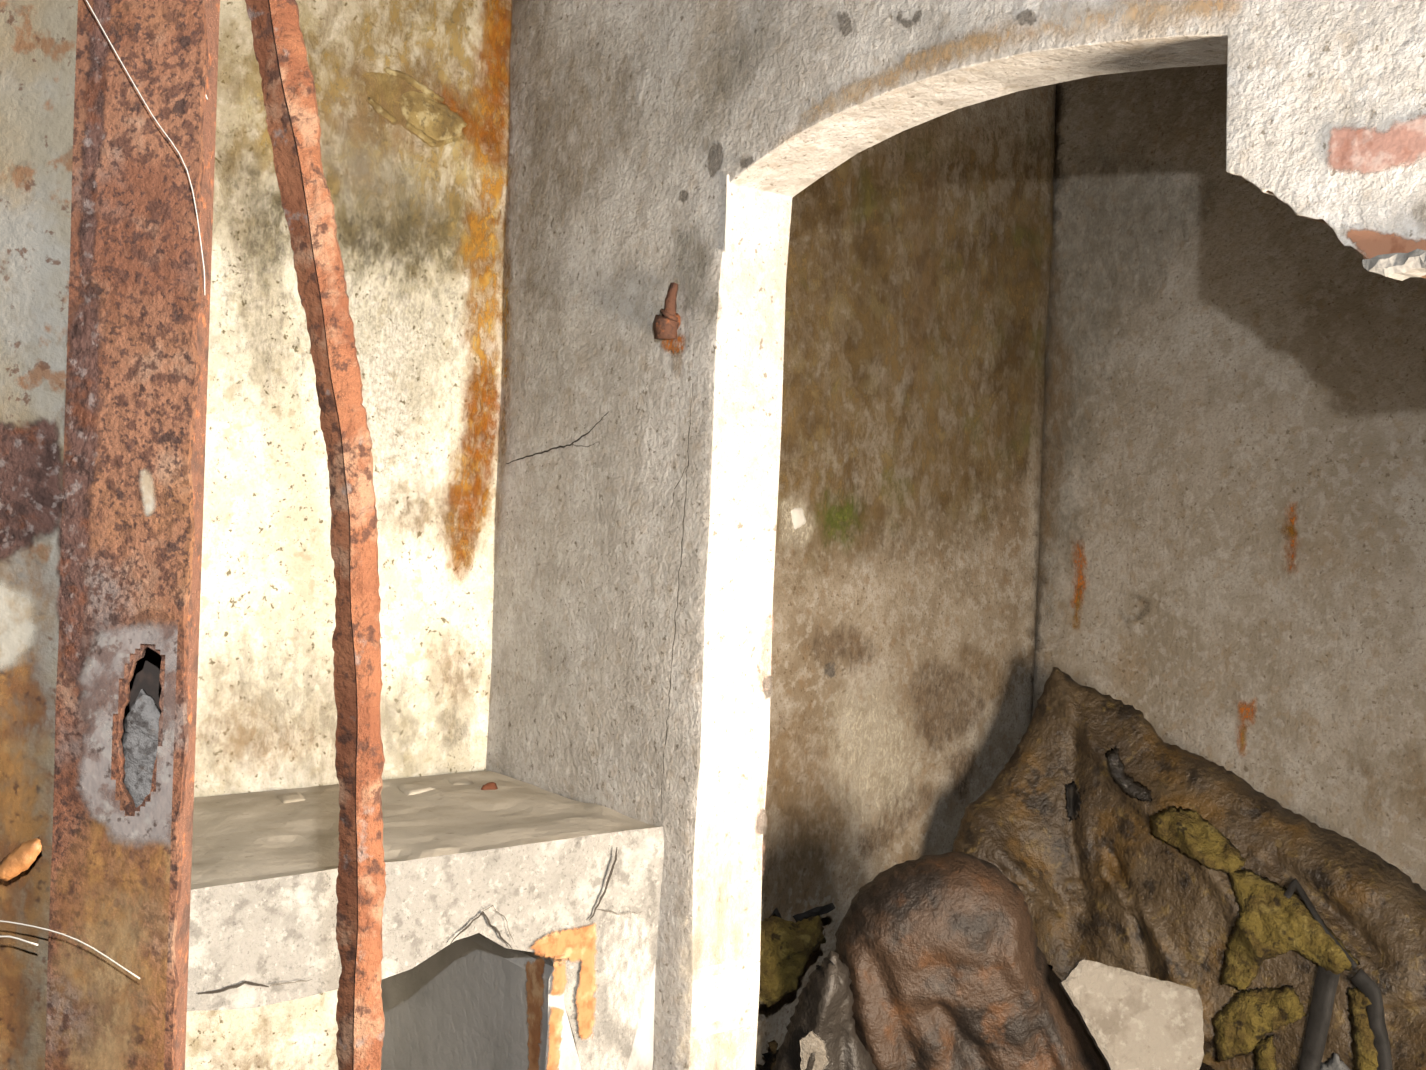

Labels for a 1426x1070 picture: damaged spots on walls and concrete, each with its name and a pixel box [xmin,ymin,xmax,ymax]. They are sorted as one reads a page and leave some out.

corrosion [0,0,111,680]
corrosion [245,0,386,1070]
corrosion [442,0,513,569]
crack [506,413,607,464]
corrosion [662,335,685,354]
spalling [1347,229,1426,281]
corrosion [0,652,64,1070]
corrosion [62,821,171,1070]
crack [198,979,312,994]
crack [450,905,515,949]